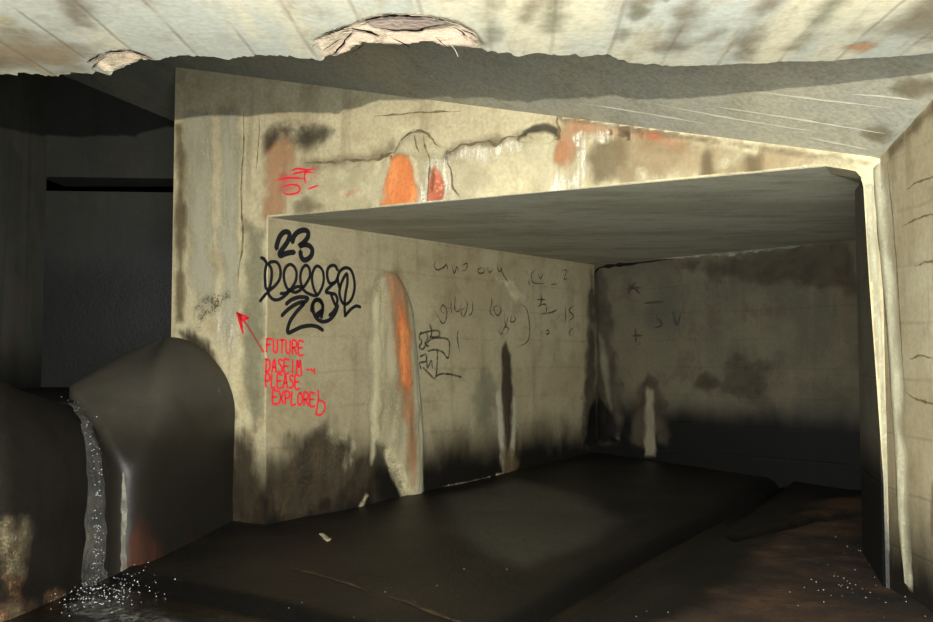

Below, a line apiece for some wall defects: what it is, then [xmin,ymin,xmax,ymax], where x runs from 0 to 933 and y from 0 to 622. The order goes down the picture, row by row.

spalling [313,14,481,56]
spalling [88,51,155,72]
crack [374,109,459,117]
crack [305,152,393,164]
crack [445,136,515,155]
rust [371,152,463,208]
leakage [182,332,216,362]
leakage [233,272,424,523]